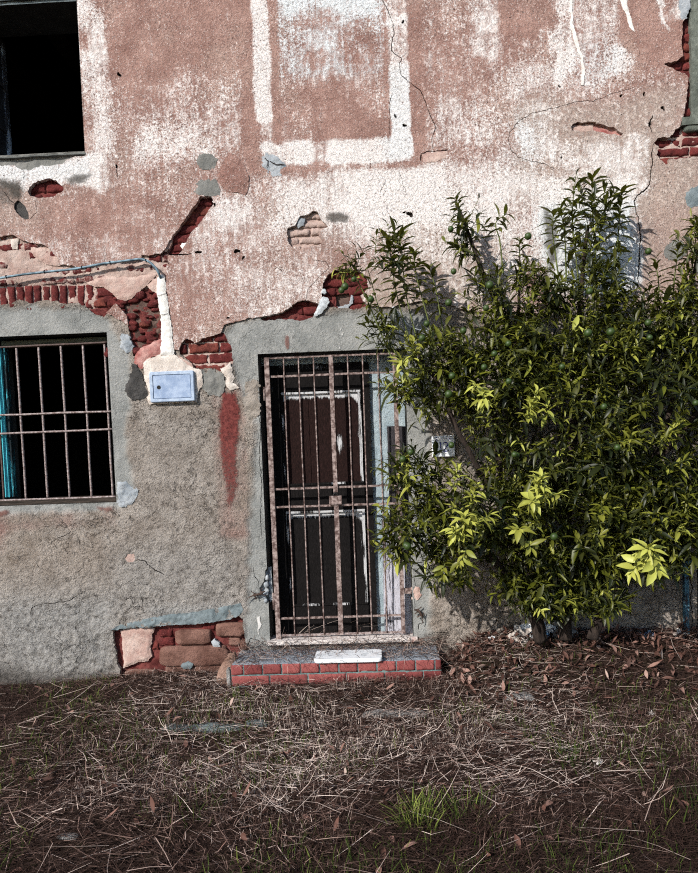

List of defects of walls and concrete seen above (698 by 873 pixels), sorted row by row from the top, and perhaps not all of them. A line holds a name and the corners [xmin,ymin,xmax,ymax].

flaking render [620,0,635,32]
crack [382,0,447,161]
crack [567,0,625,105]
flaking render [668,12,691,117]
flaking render [0,151,85,170]
flaking render [31,180,63,198]
flaking render [571,123,621,136]
flaking render [654,128,698,164]
flaking render [287,213,327,249]
flaking render [0,198,216,369]
flaking render [178,333,239,390]
flaking render [114,616,250,675]